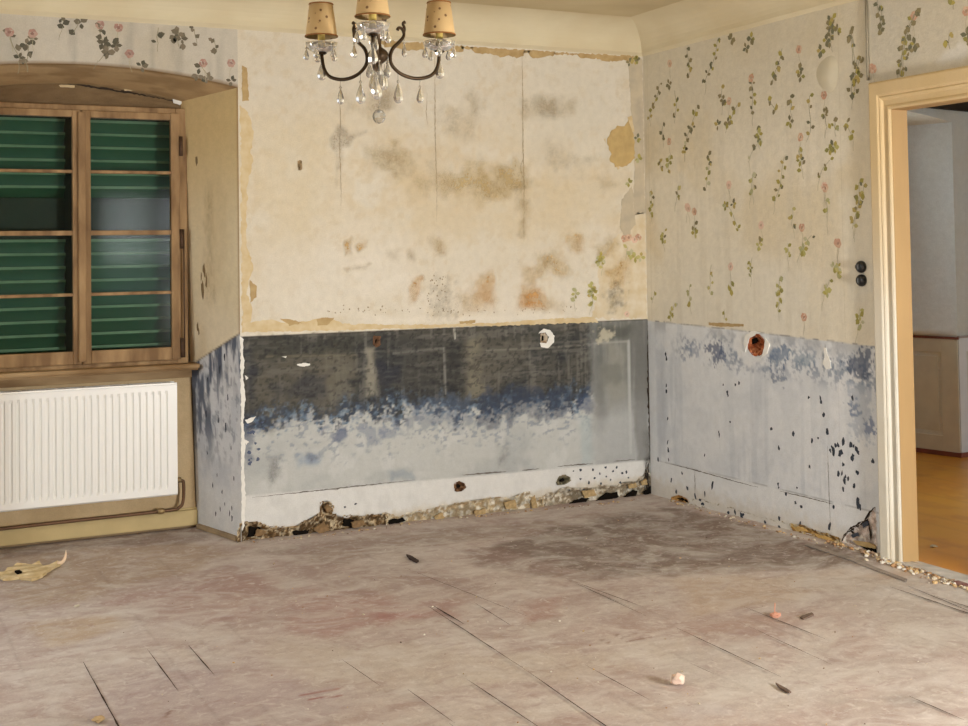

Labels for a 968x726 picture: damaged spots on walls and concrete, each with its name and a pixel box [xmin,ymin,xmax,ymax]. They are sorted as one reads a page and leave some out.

peeling [381,40,427,51]
peeling [445,45,634,62]
peeling [212,66,651,543]
peeling [709,322,770,358]
spalling [670,396,877,553]